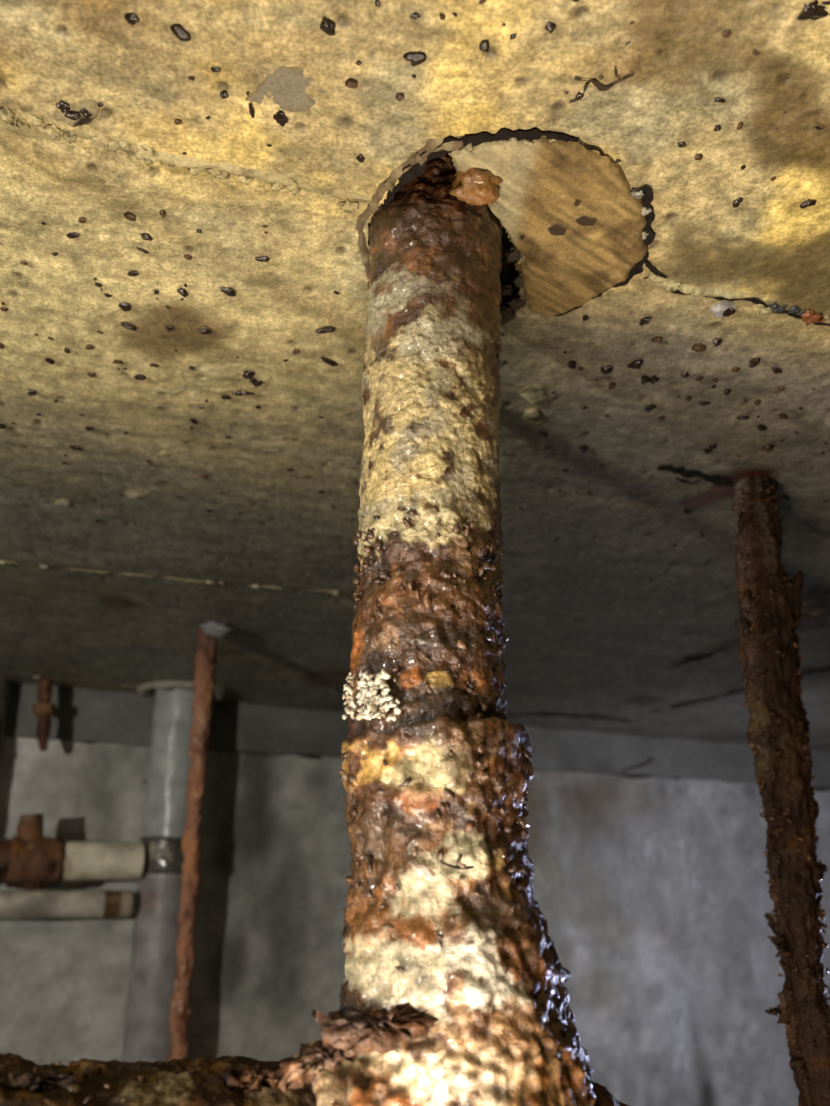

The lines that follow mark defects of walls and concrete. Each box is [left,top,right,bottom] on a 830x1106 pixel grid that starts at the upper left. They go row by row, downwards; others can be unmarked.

spalling [499,226,527,326]
rust [305,673,349,686]
rust [764,913,788,952]
rust [765,985,793,1024]
rust [218,1002,439,1094]